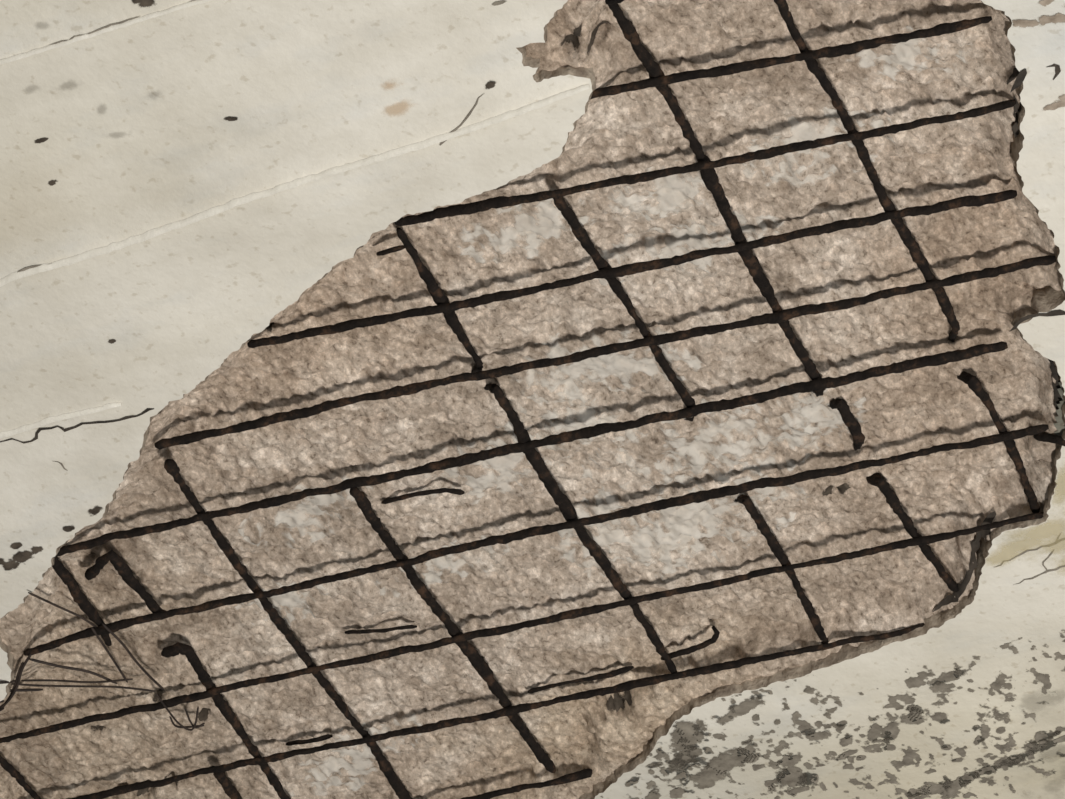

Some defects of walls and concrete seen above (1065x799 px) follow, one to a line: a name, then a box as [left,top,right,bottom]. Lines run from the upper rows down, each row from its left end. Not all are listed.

crack [0,408,153,444]
spalling [0,594,93,680]
spalling [0,685,166,743]
spalling [20,633,160,691]
spalling [0,697,254,799]
spalling [114,599,307,700]
spalling [220,673,362,757]
spalling [320,643,503,733]
spalling [467,603,677,706]
spalling [378,640,842,799]
spalling [638,572,823,672]
peeling [629,656,1065,799]